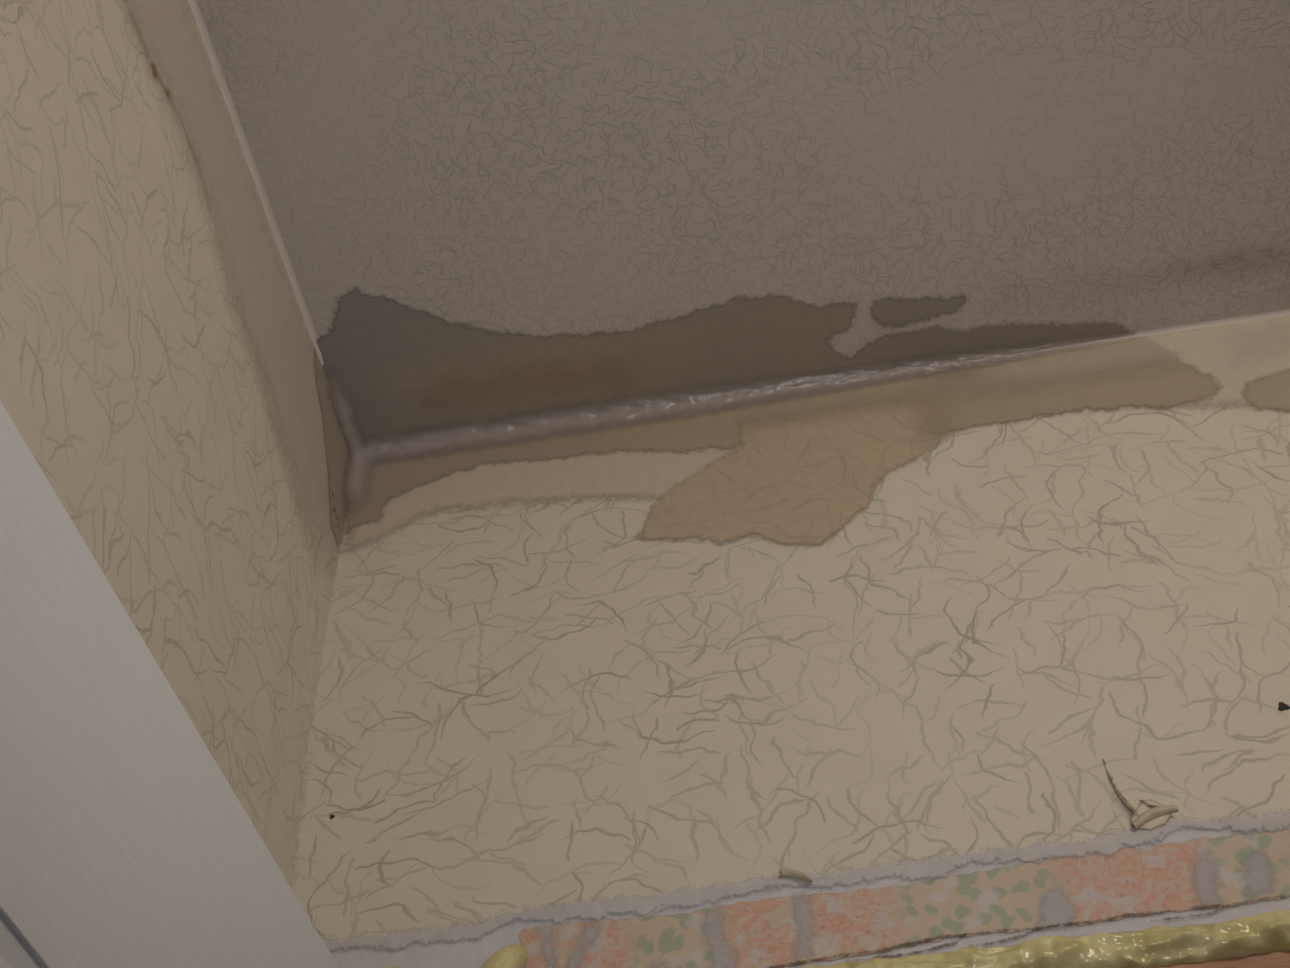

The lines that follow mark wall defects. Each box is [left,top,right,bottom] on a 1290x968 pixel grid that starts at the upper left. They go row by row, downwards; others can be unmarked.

water stain [315,289,1220,545]
water stain [1244,370,1290,411]
peeling [322,811,1290,968]